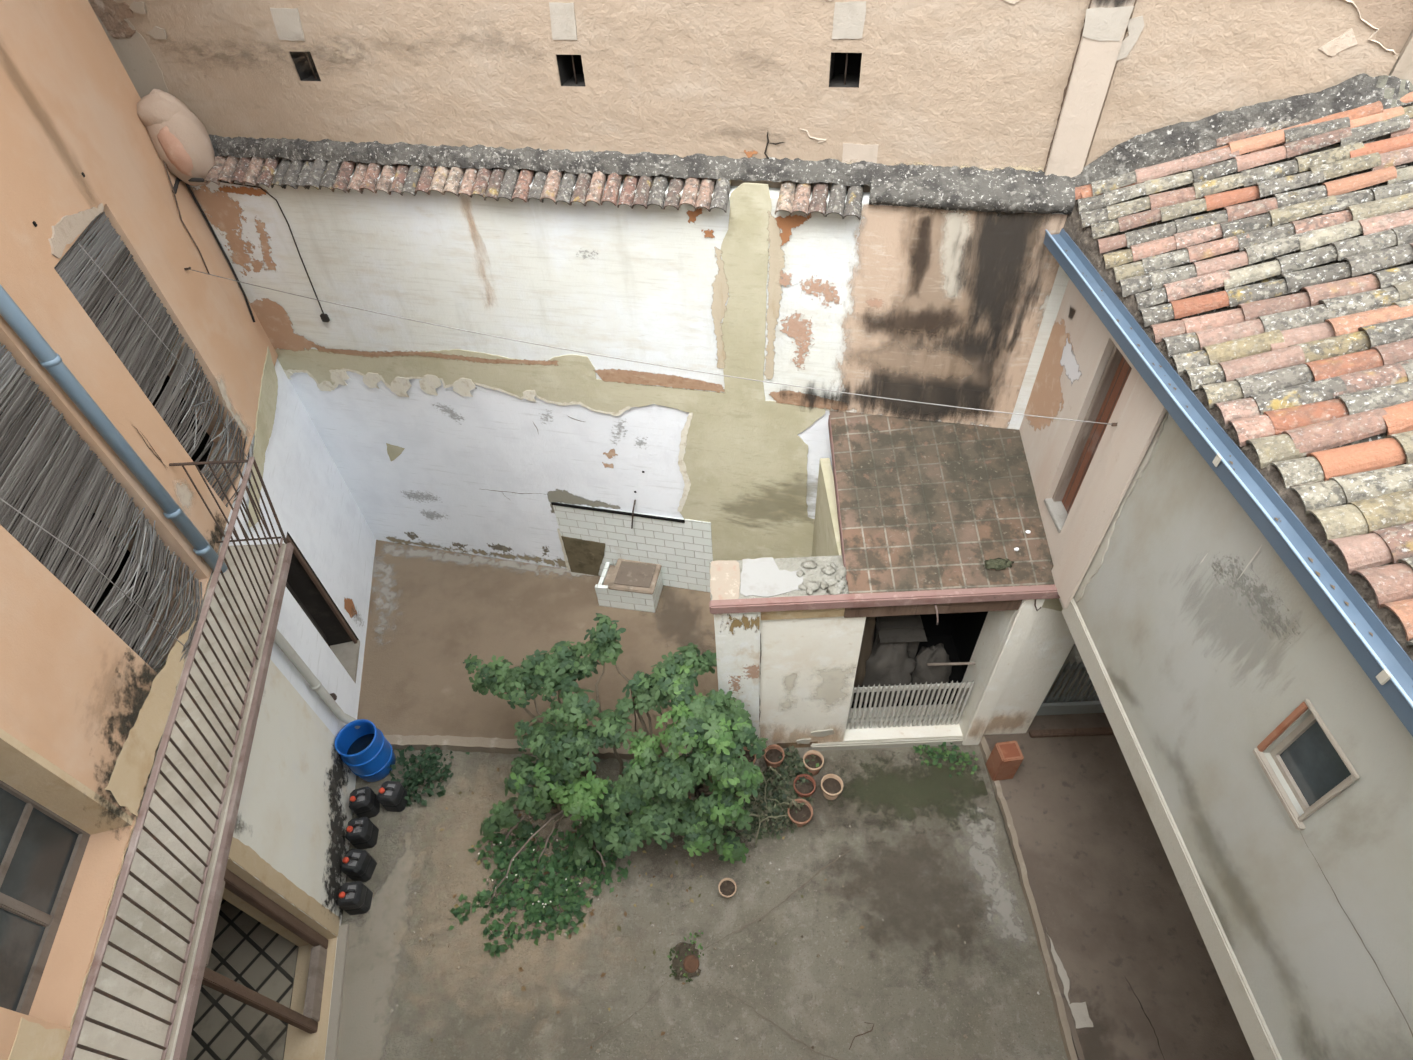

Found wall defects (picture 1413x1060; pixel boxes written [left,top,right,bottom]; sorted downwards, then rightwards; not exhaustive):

flaking render [89,0,167,40]
damp [1096,0,1130,8]
flaking render [32,203,104,258]
peeling [191,185,277,276]
peeling [764,211,848,411]
damp [803,204,1067,429]
flaking render [602,449,618,468]
flaking render [386,532,566,567]
peeling [728,665,759,694]
damp [98,653,166,833]
crack [849,1022,874,1050]